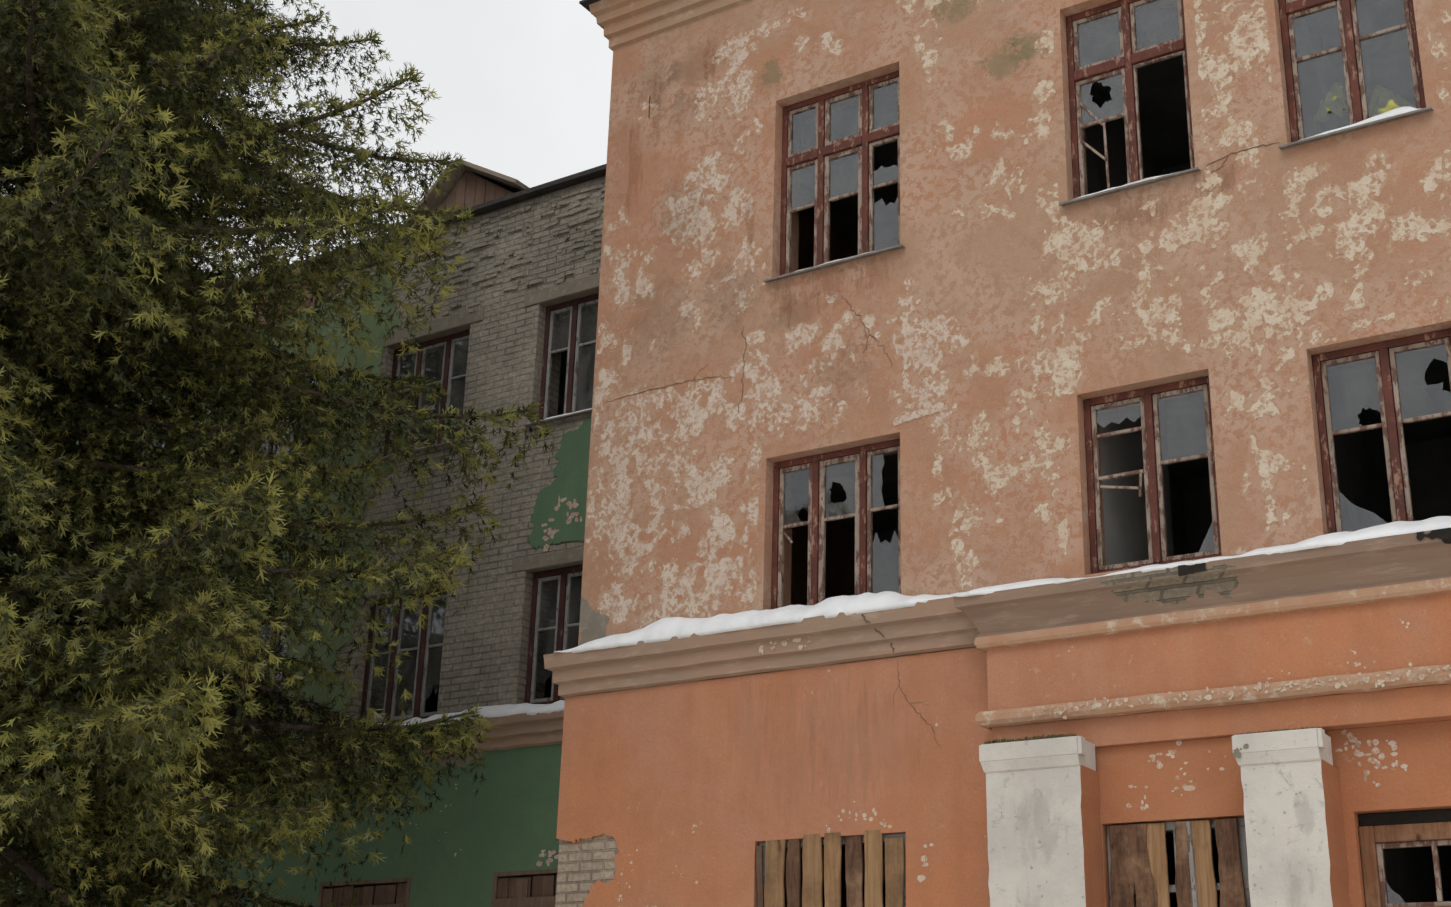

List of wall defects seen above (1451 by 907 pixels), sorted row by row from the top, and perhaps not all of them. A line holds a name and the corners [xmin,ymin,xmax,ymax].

crack [1206,142,1280,175]
flaking render [408,0,1451,645]
crack [861,613,939,746]
peeling [1039,648,1451,719]
spalling [1335,729,1408,787]
flaking render [536,815,657,907]